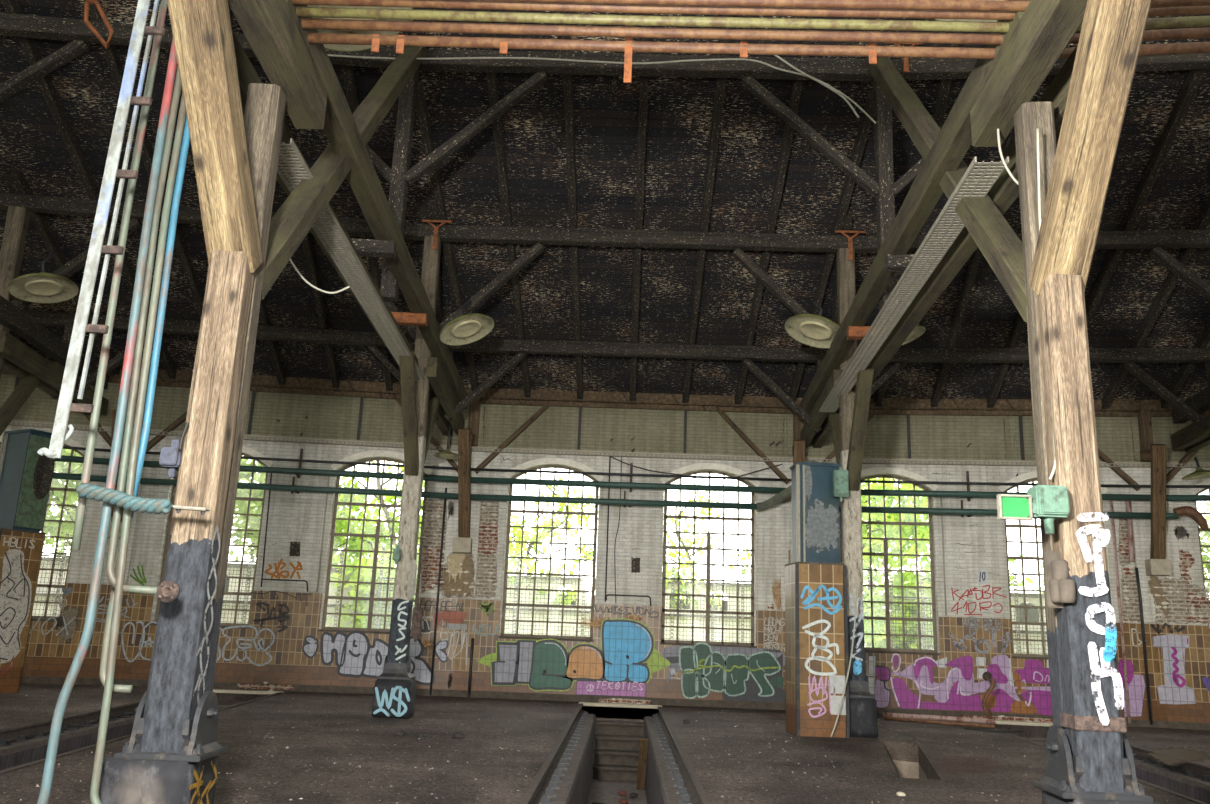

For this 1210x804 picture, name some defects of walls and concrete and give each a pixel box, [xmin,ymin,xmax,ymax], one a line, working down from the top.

peeling [421,499,499,598]
peeling [1117,510,1210,624]